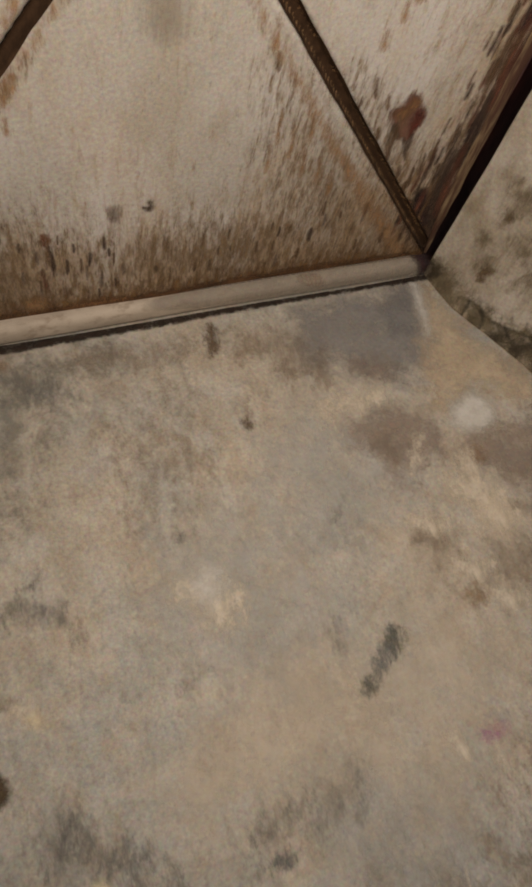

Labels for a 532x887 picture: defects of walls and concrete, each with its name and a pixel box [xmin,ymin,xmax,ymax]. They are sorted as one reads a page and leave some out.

corrosion [0,0,532,320]
damp [427,259,532,373]